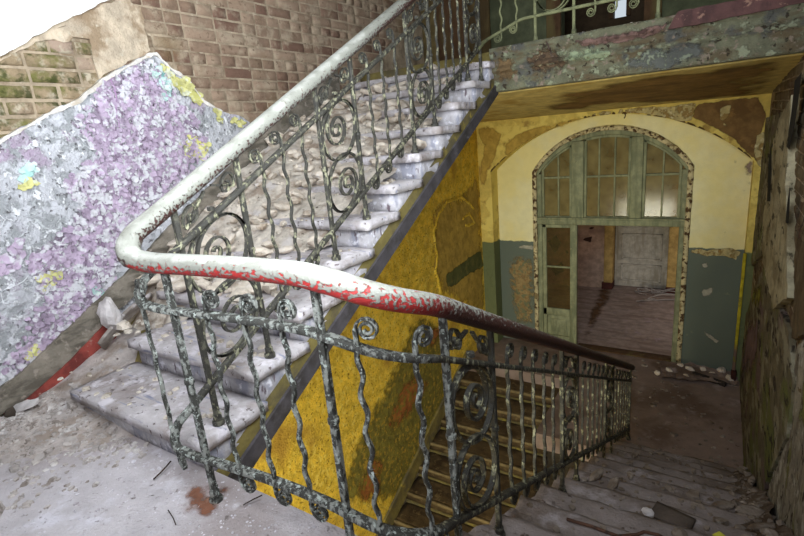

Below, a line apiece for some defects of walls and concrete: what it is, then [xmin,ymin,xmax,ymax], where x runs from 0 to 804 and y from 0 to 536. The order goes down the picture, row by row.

spalling [338,0,420,90]
damp [550,62,774,110]
peeling [568,0,804,61]
peeling [0,0,397,380]
spalling [433,56,804,363]
corrosion [186,487,216,516]